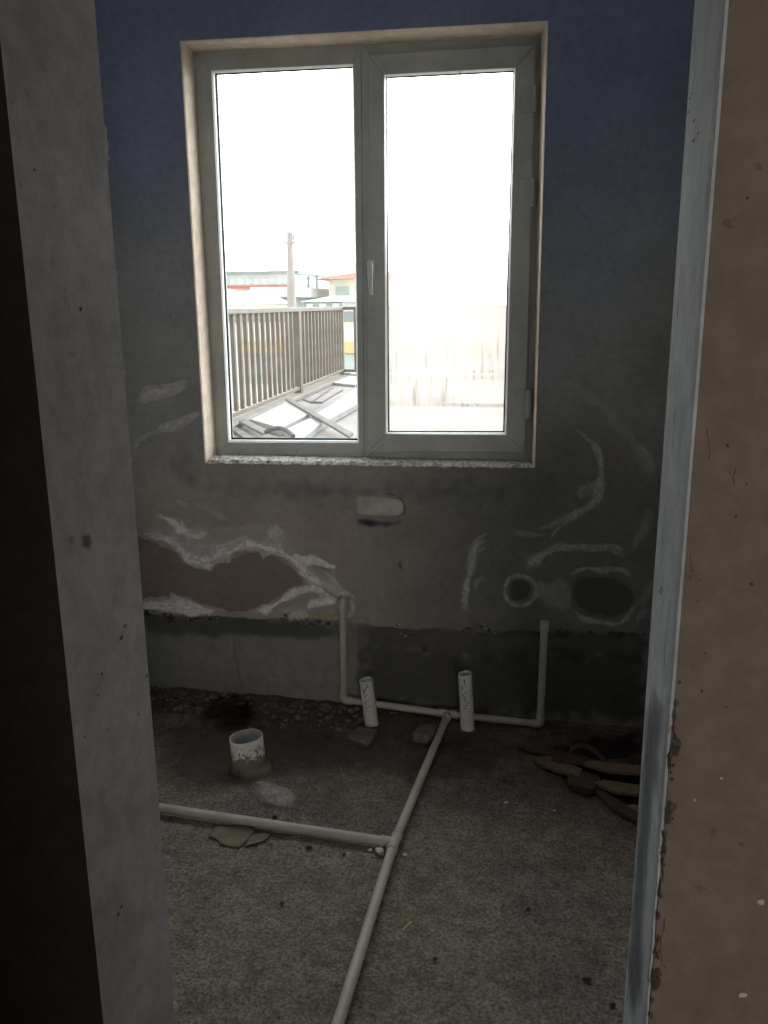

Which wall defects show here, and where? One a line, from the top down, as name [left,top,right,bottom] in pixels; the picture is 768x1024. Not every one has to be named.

leakage [504,431,621,607]